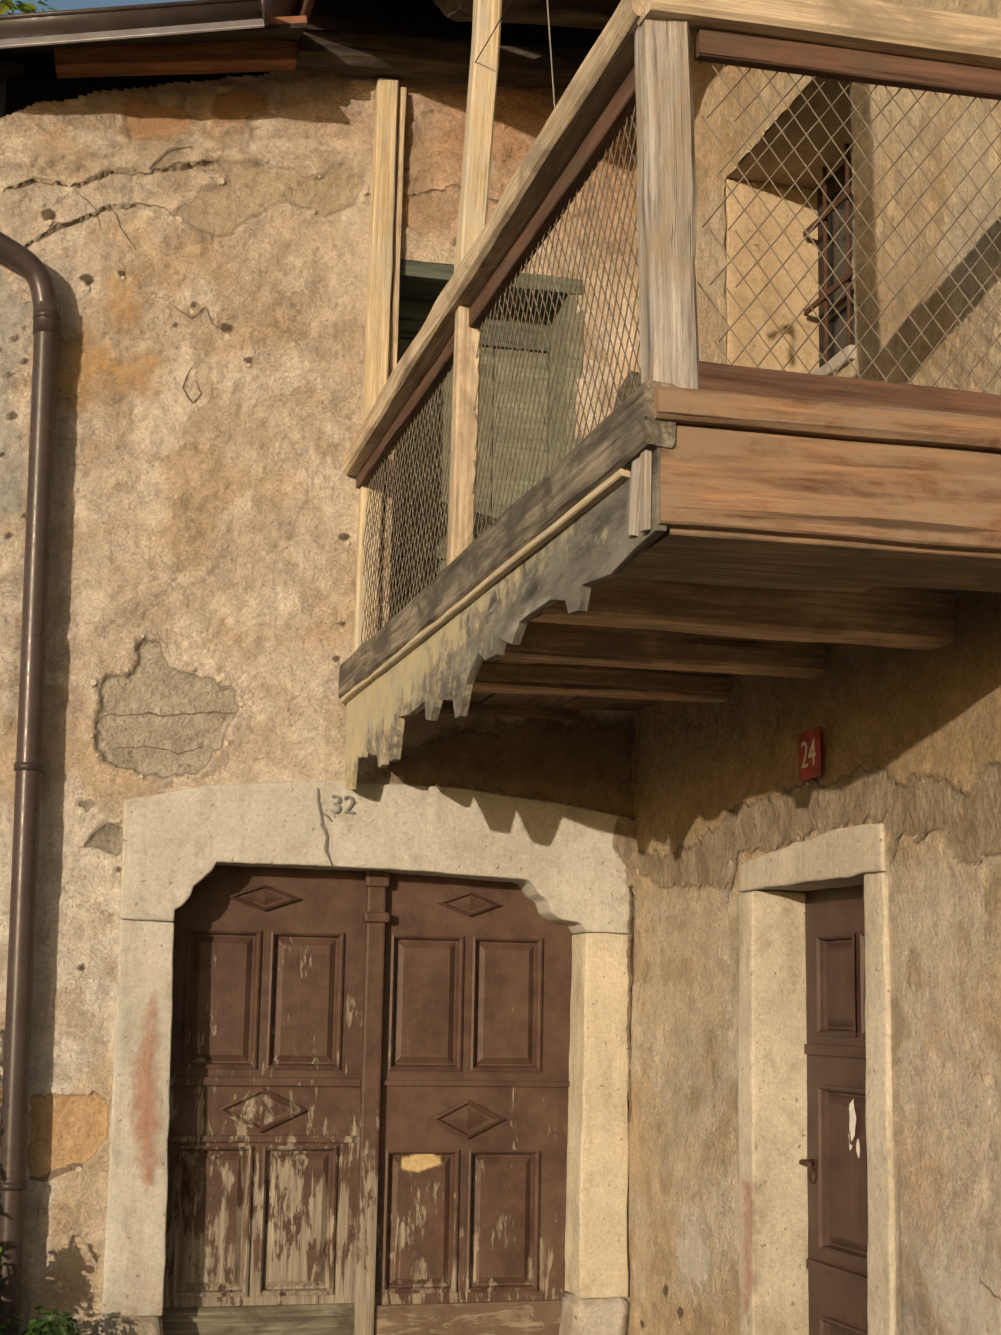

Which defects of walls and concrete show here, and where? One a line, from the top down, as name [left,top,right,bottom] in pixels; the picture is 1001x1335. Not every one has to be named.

crack [3,146,216,250]
flaking render [89,633,244,779]
crack [317,788,332,865]
peeling [613,763,1001,903]
flaking render [25,1090,111,1182]